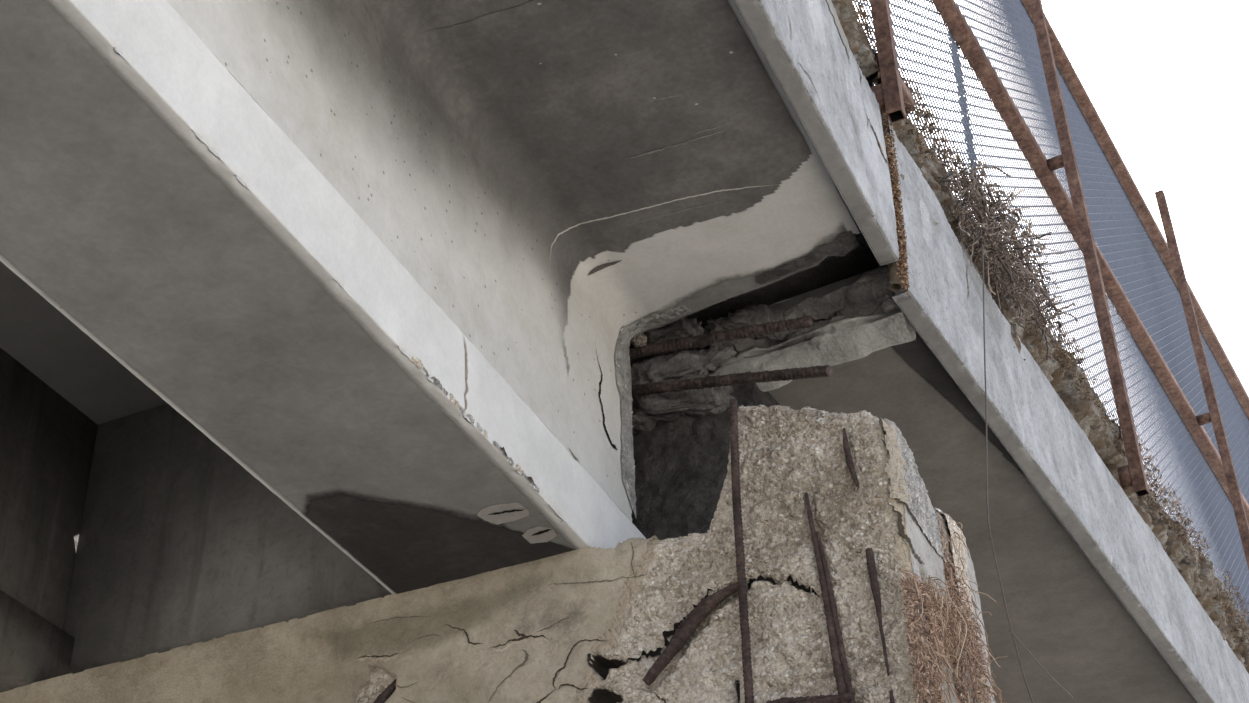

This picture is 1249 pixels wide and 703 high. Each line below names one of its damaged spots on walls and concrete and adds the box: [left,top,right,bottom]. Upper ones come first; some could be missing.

water stain [310,0,895,337]
peeling [588,260,622,276]
spalling [755,231,859,285]
spalling [410,357,540,492]
crack [595,345,618,450]
peeling [477,502,557,544]
crack [545,542,654,585]
spalling [572,266,973,703]
crack [356,575,819,703]